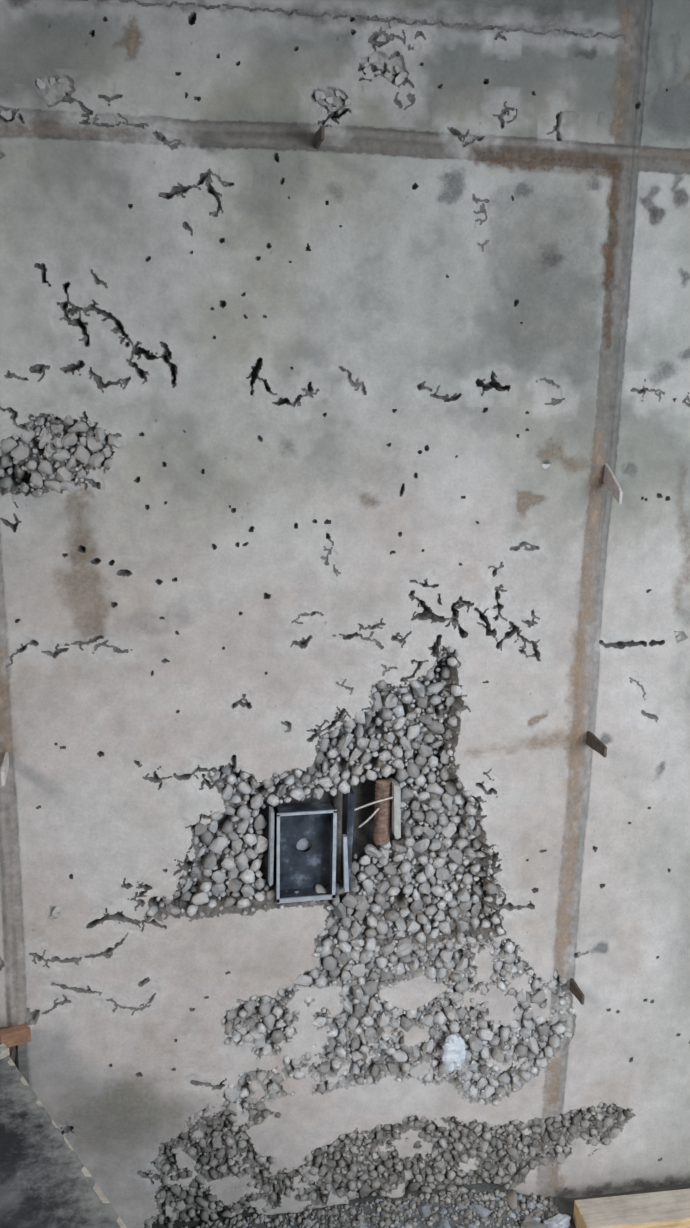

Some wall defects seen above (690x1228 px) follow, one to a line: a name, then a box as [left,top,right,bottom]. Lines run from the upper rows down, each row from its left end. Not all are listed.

crack [81,0,623,127]
spalling [360,51,409,87]
crack [158,168,234,236]
corrosion [476,149,620,347]
flaking render [0,416,121,498]
crack [0,263,178,532]
crack [246,357,367,407]
crack [417,370,565,406]
crack [281,541,541,742]
crack [29,755,237,1016]
flaking render [145,646,635,1228]
crack [471,769,535,914]